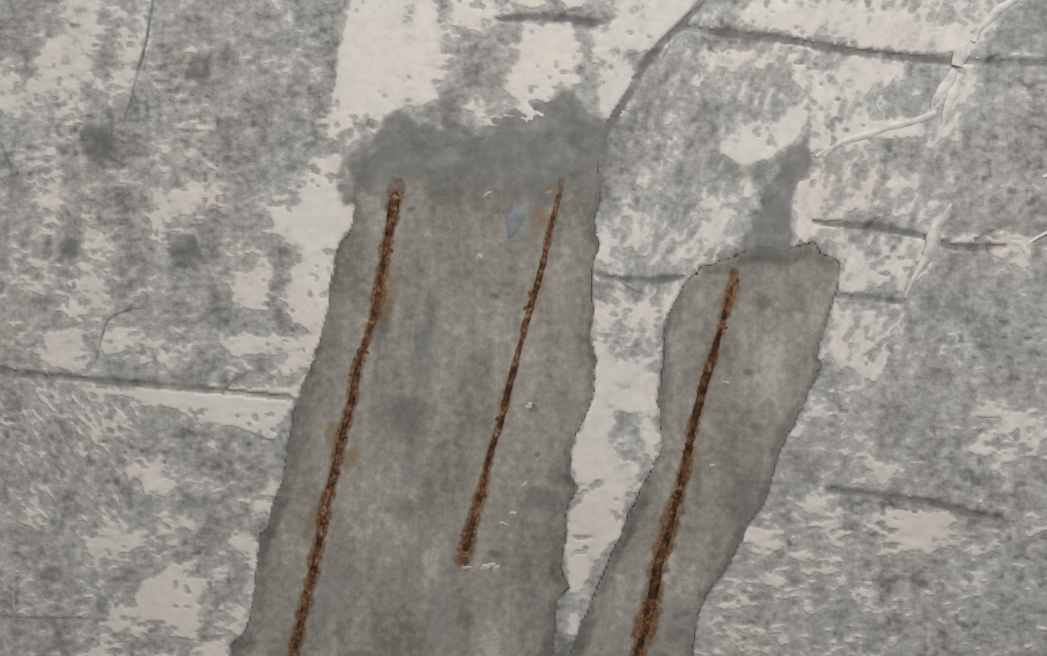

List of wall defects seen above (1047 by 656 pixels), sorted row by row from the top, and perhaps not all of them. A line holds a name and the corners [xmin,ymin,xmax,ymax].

crack [646,0,705,63]
crack [757,35,851,52]
crack [603,87,633,136]
peeling [106,94,230,264]
corrosion [541,178,564,259]
crack [880,227,926,238]
corrosion [289,178,404,656]
peeling [104,454,234,501]
corrosion [457,393,510,566]
peeling [58,486,200,574]
corrosion [631,457,693,656]
peeling [786,475,1034,627]